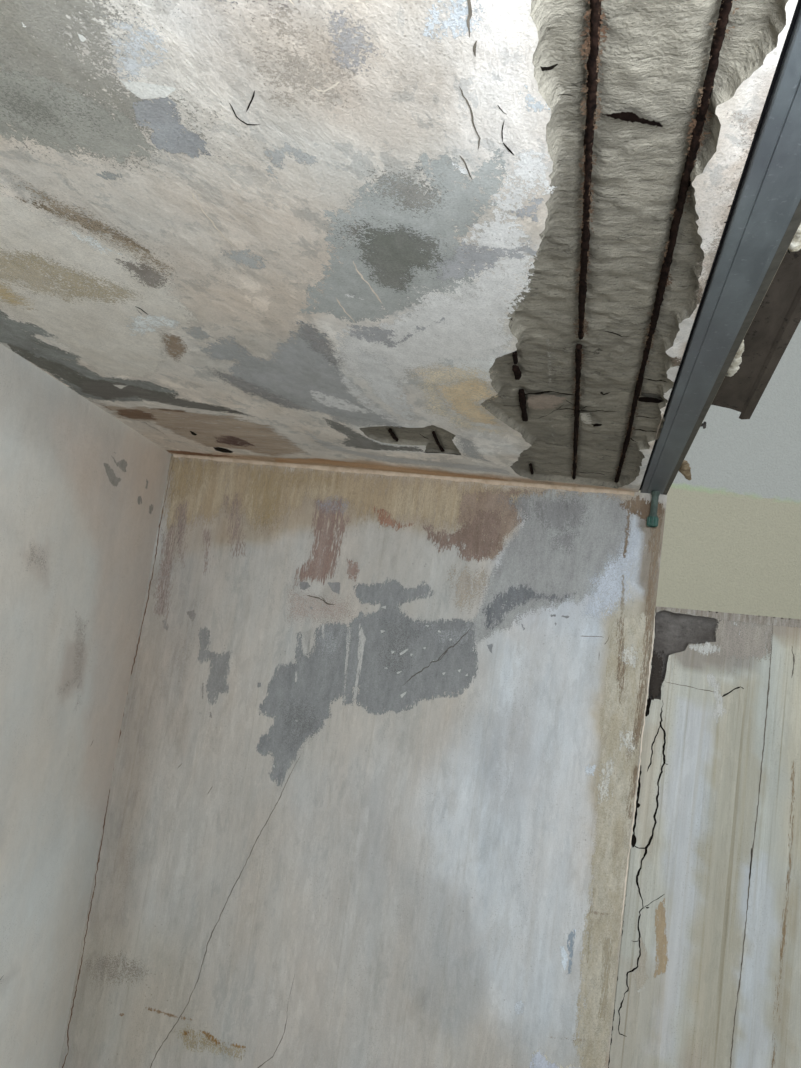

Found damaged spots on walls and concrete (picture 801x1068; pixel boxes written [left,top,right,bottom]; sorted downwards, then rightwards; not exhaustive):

damp [0,0,230,180]
damp [162,0,384,113]
crack [466,0,477,57]
corrosion [684,81,718,166]
damp [0,176,176,310]
peeling [182,142,510,455]
corrosion [571,0,610,478]
spalling [481,0,788,489]
peeling [256,577,493,791]
crack [150,755,301,1068]
crack [608,629,795,1068]
corrosion [146,1007,246,1060]